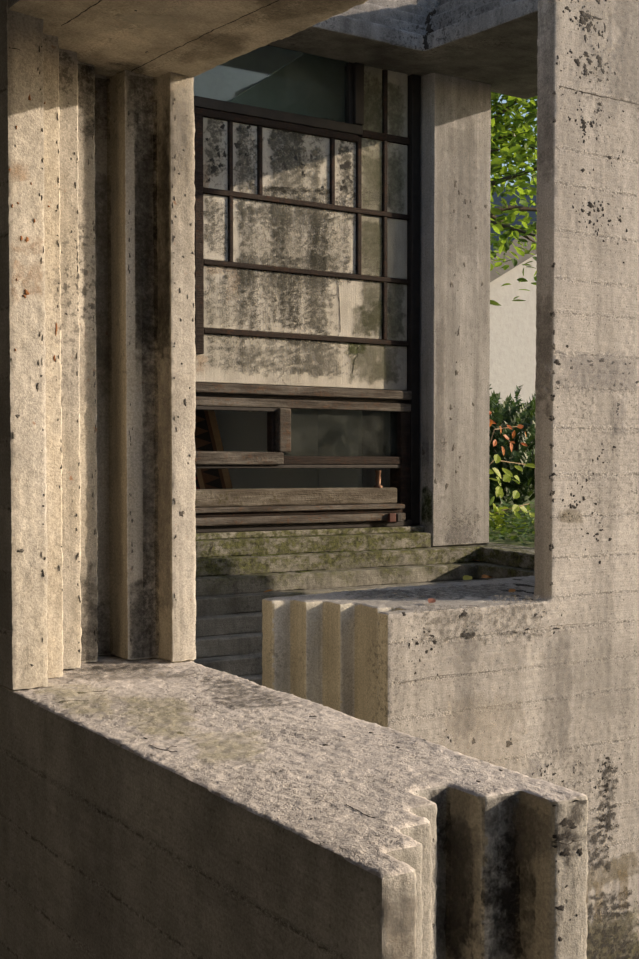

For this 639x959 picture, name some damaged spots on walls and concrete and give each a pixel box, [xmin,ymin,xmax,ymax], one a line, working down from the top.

crack [131,0,279,72]
damp [200,129,363,379]
damp [64,64,191,681]
damp [203,676,292,711]
damp [436,751,639,959]